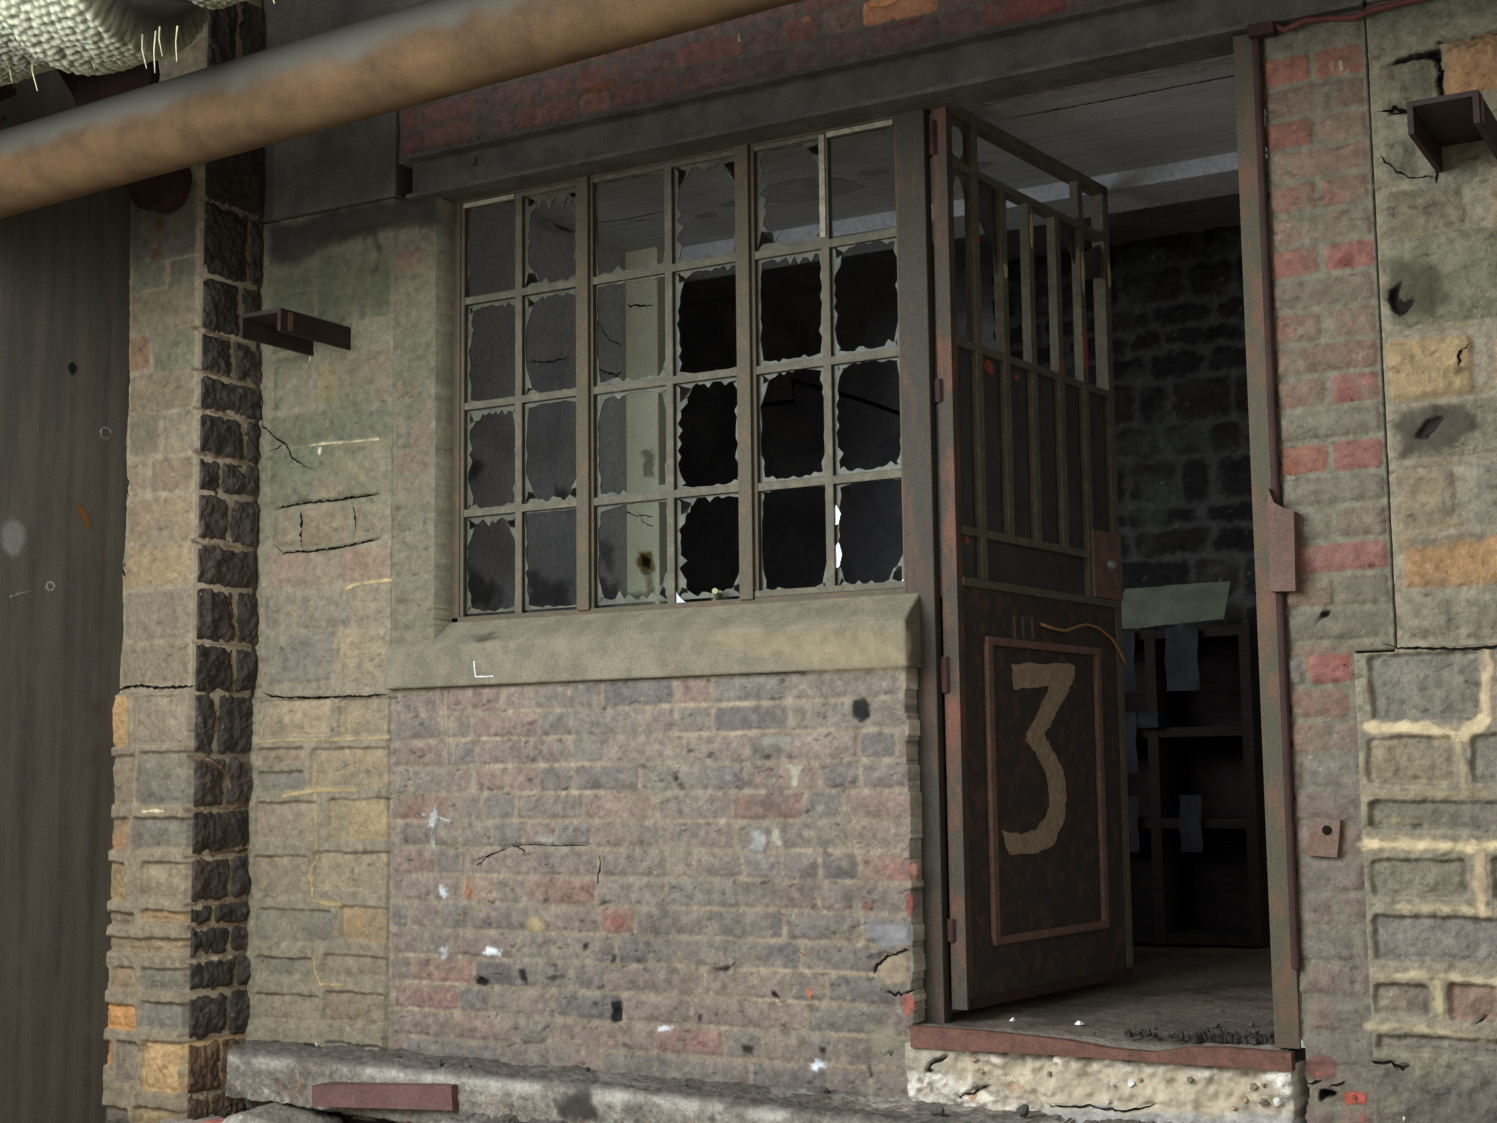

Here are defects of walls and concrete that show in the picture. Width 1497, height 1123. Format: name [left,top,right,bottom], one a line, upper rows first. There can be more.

crack [259,391,313,470]